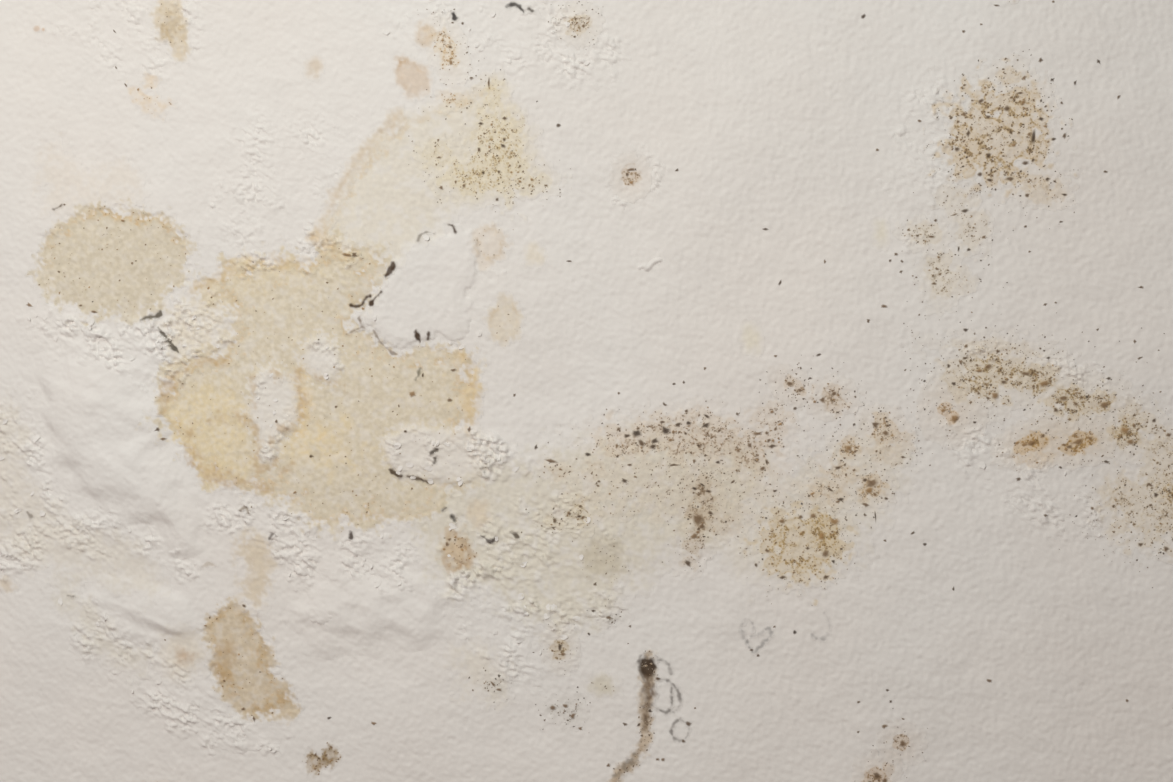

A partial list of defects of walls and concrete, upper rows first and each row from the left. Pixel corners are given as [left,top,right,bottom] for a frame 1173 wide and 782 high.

leakage [306,0,573,273]
leakage [153,269,250,382]
leakage [404,49,1173,782]